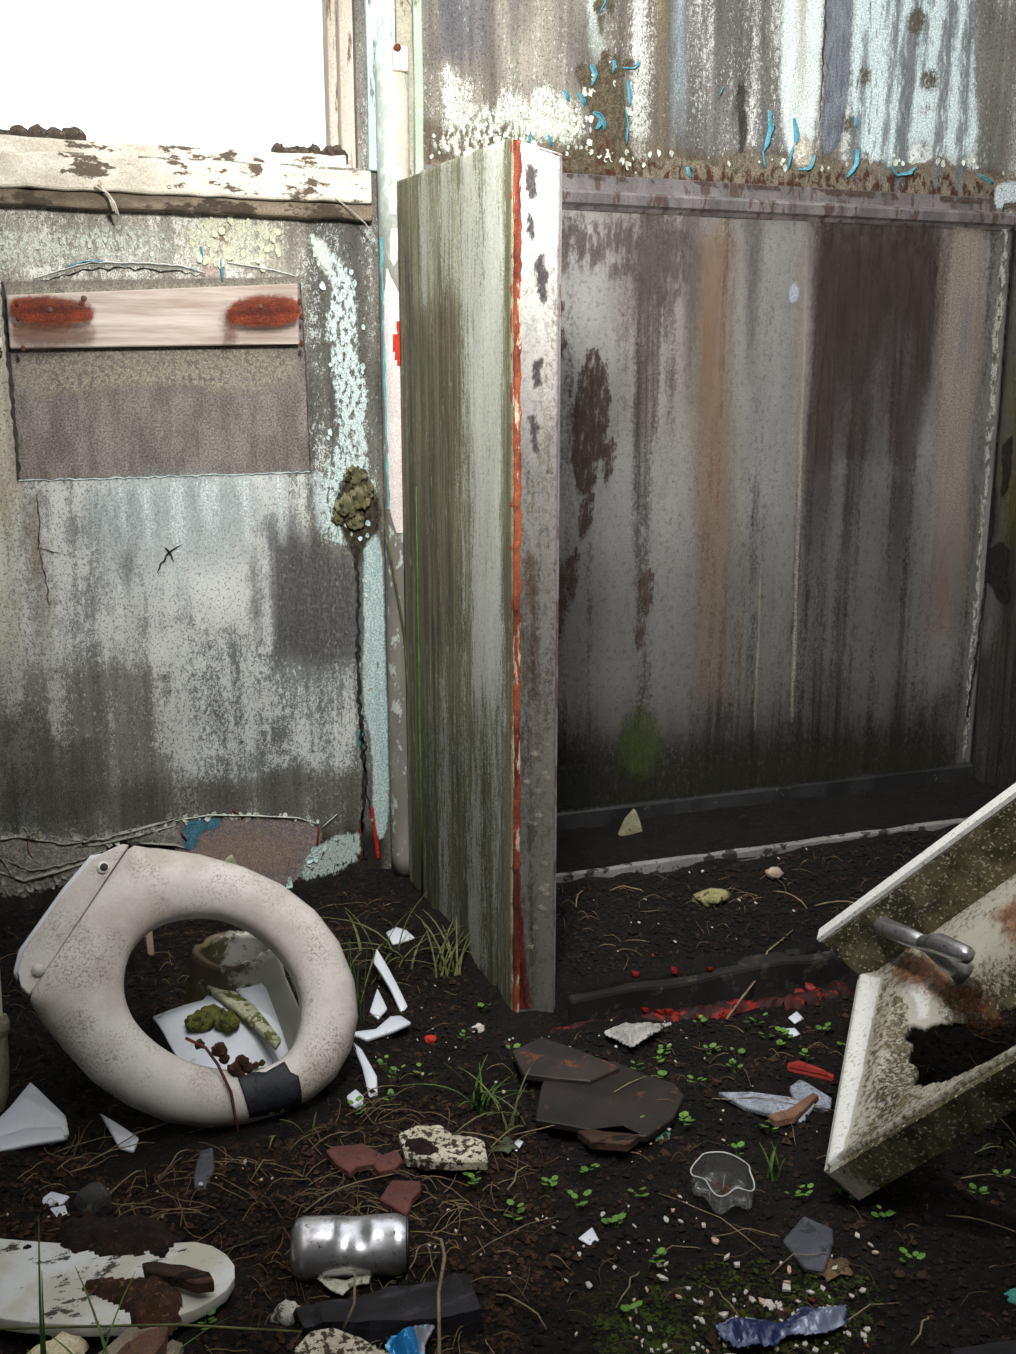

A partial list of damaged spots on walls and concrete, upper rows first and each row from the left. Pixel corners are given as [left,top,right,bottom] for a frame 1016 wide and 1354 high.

peeling [393,71,408,179]
peeling [424,0,1016,213]
damp [102,478,254,577]
spalling [0,193,403,839]
damp [273,474,287,528]
damp [312,474,322,519]
damp [789,223,1015,758]
damp [286,551,351,659]
spalling [0,809,361,898]